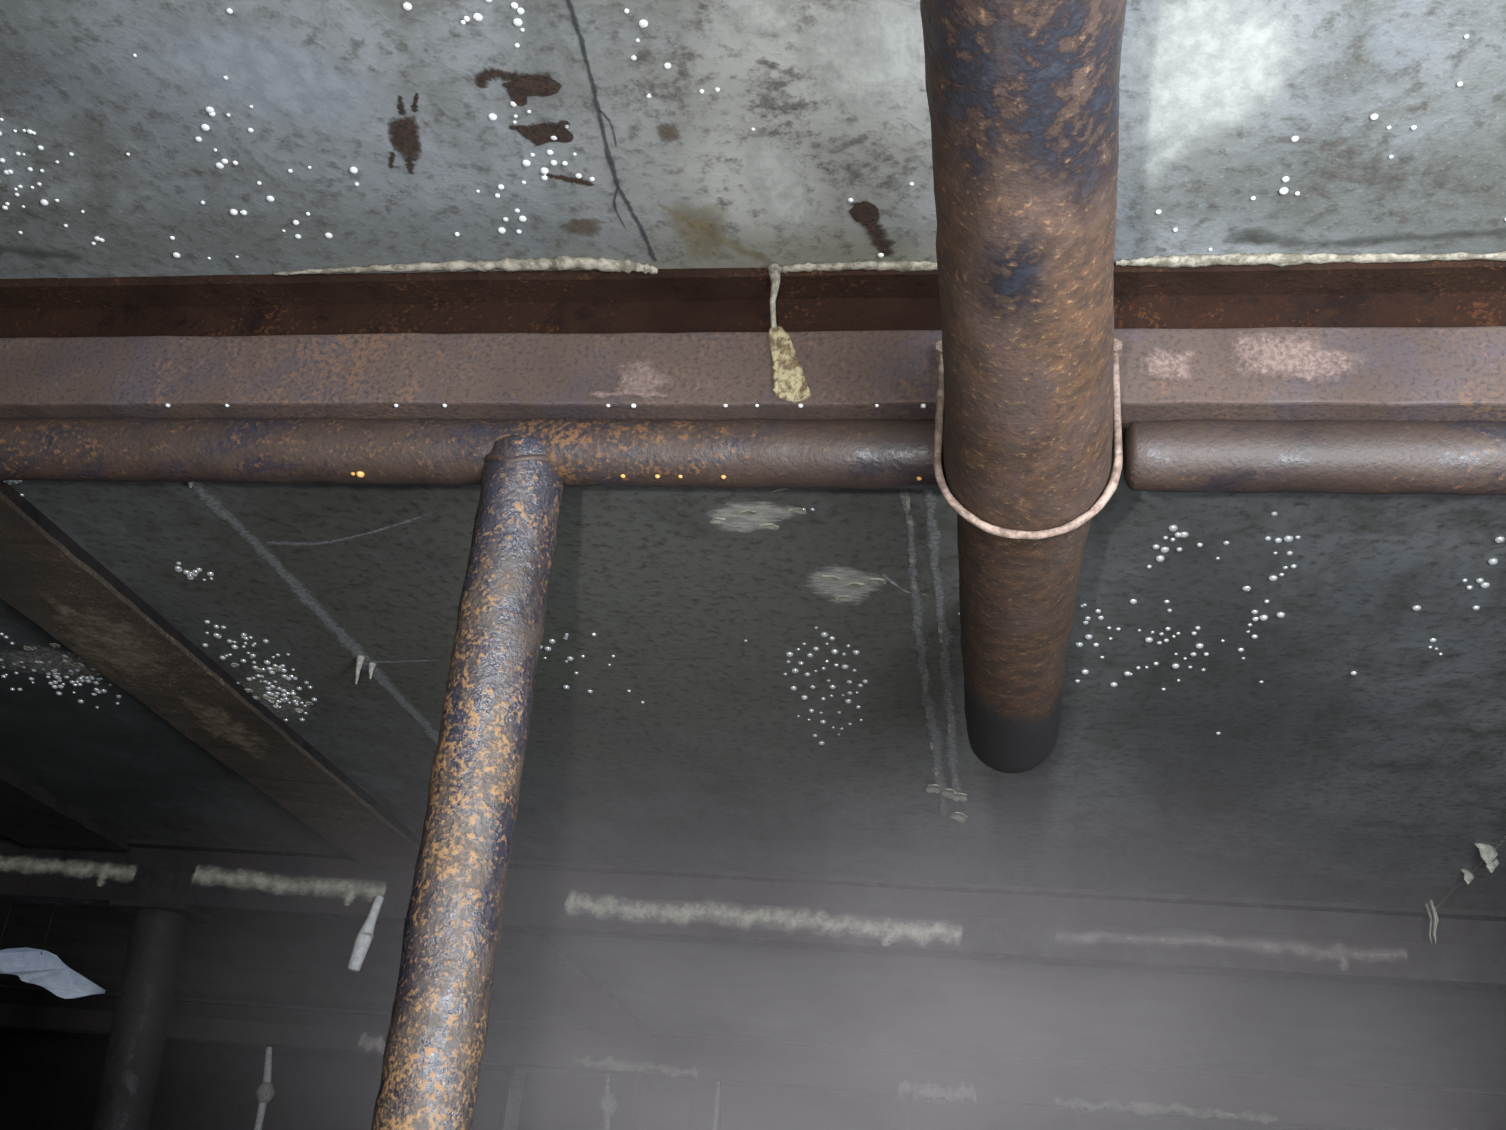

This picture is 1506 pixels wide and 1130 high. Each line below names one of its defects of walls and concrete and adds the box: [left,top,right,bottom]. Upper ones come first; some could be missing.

crack [566,0,656,261]
corrosion [593,365,666,396]
leakage [767,260,937,401]
corrosion [1149,357,1186,376]
corrosion [1240,339,1345,378]
leakage [899,489,968,823]
peeling [1425,836,1506,944]